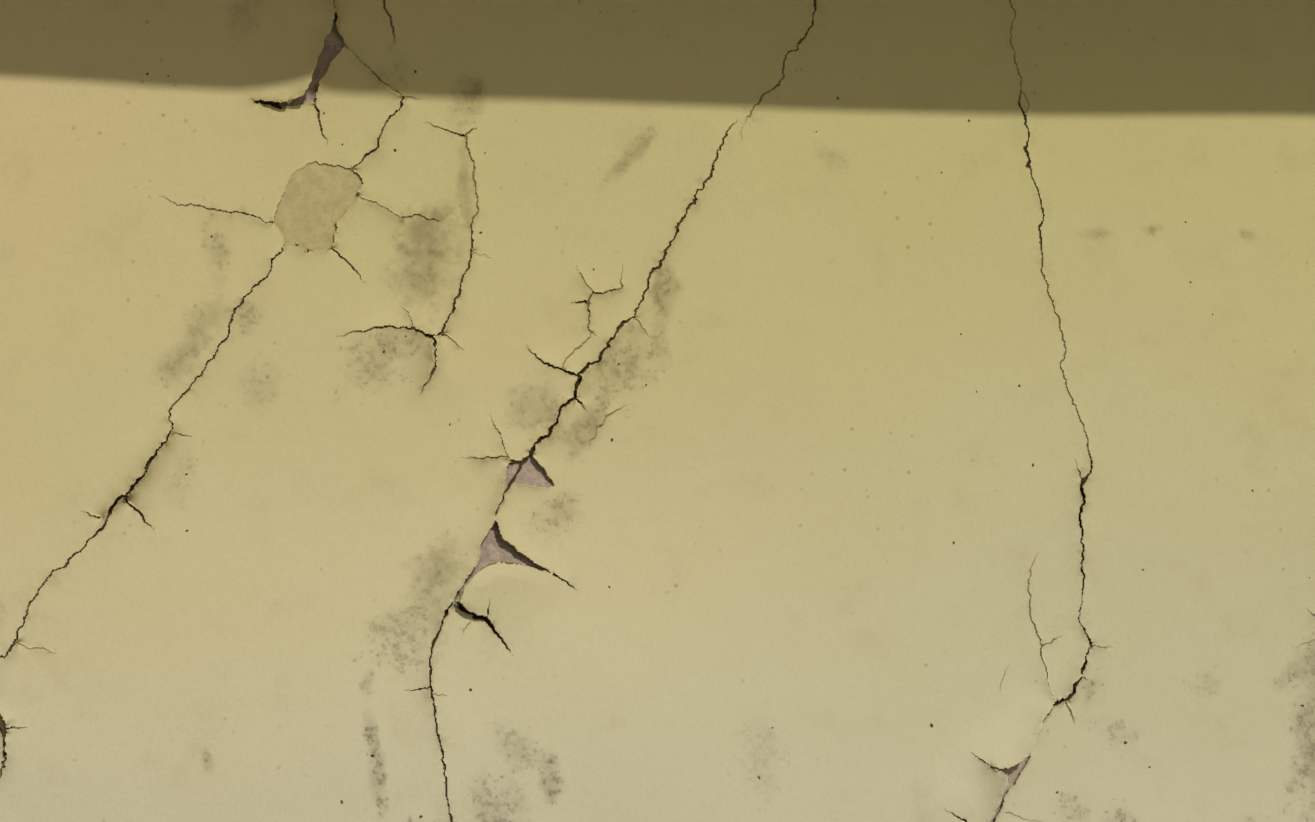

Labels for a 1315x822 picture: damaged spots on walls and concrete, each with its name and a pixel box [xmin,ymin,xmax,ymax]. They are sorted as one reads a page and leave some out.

crack [0,195,297,815]
peeling [245,0,368,145]
crack [331,0,497,406]
crack [396,584,475,822]
peeling [414,414,582,656]
crack [518,0,826,456]
peeling [917,644,1103,822]
crack [997,0,1113,726]